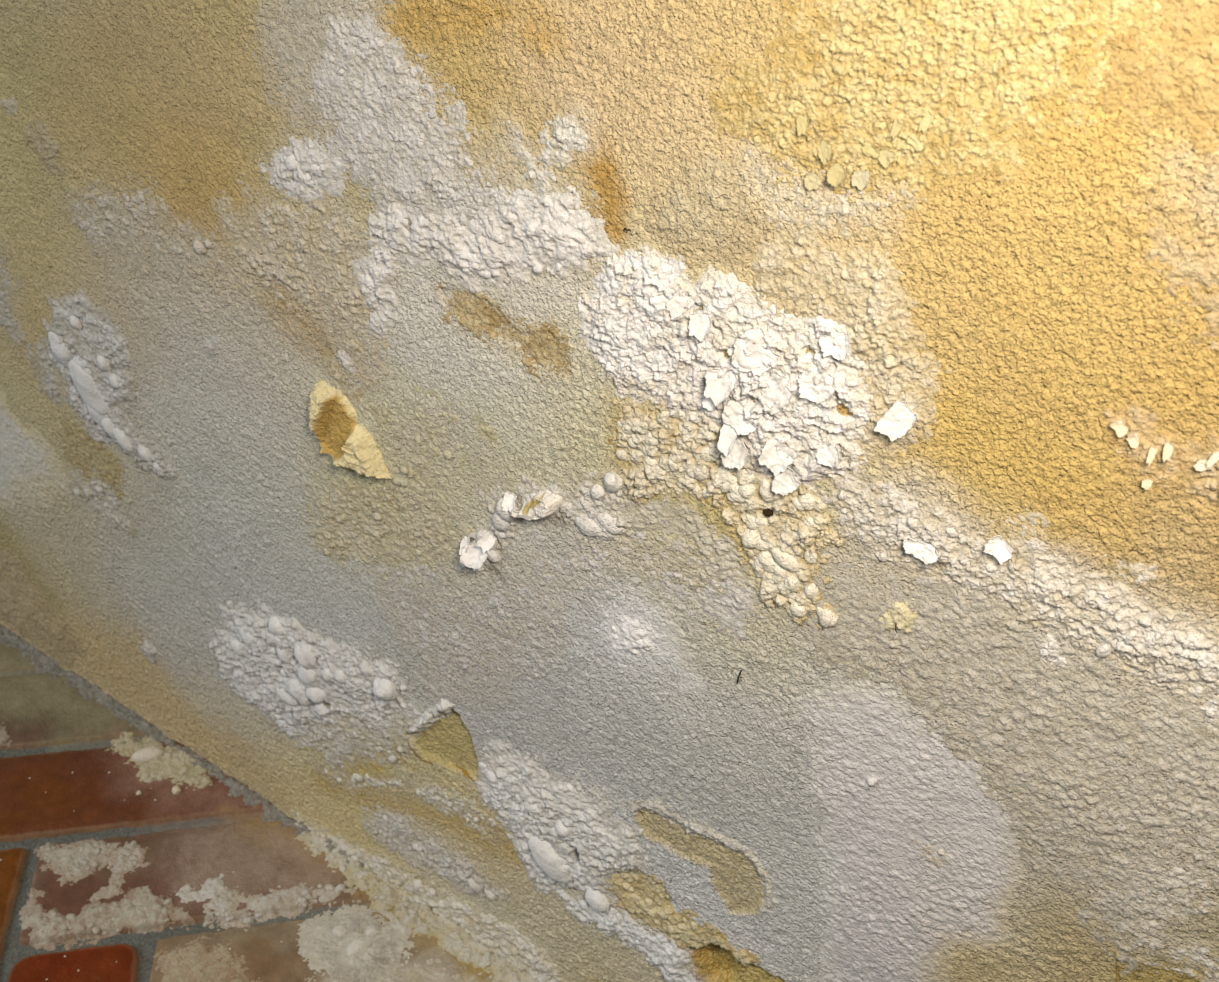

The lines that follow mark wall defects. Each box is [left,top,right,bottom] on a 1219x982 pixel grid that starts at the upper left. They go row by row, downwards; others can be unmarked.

water stain [237,0,695,470]
peeling [431,244,918,512]
peeling [459,531,497,570]
peeling [502,490,562,521]
peeling [1098,401,1219,506]
spalling [408,699,479,781]
water stain [19,721,538,982]
spalling [625,797,779,919]
spalling [605,867,790,982]